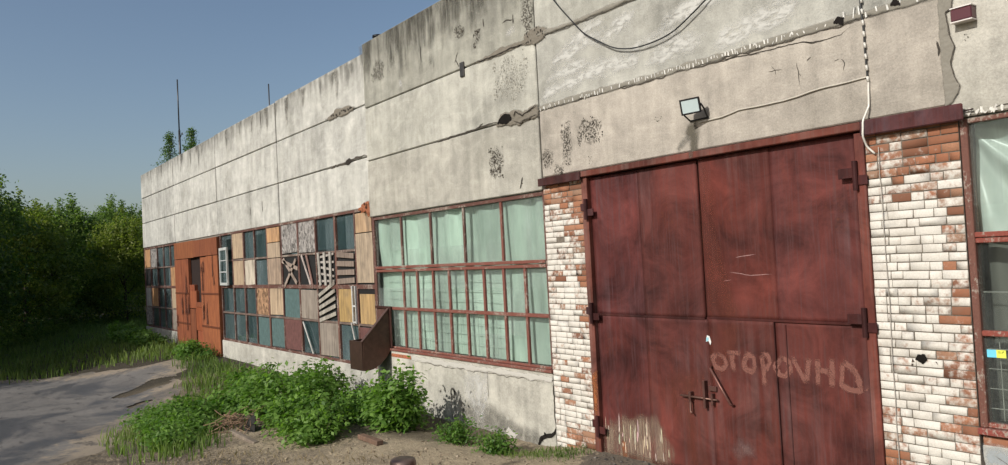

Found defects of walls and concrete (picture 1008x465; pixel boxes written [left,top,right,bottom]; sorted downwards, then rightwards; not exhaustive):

spalling [474,0,901,127]
spalling [327,105,354,121]
peeling [605,417,667,460]